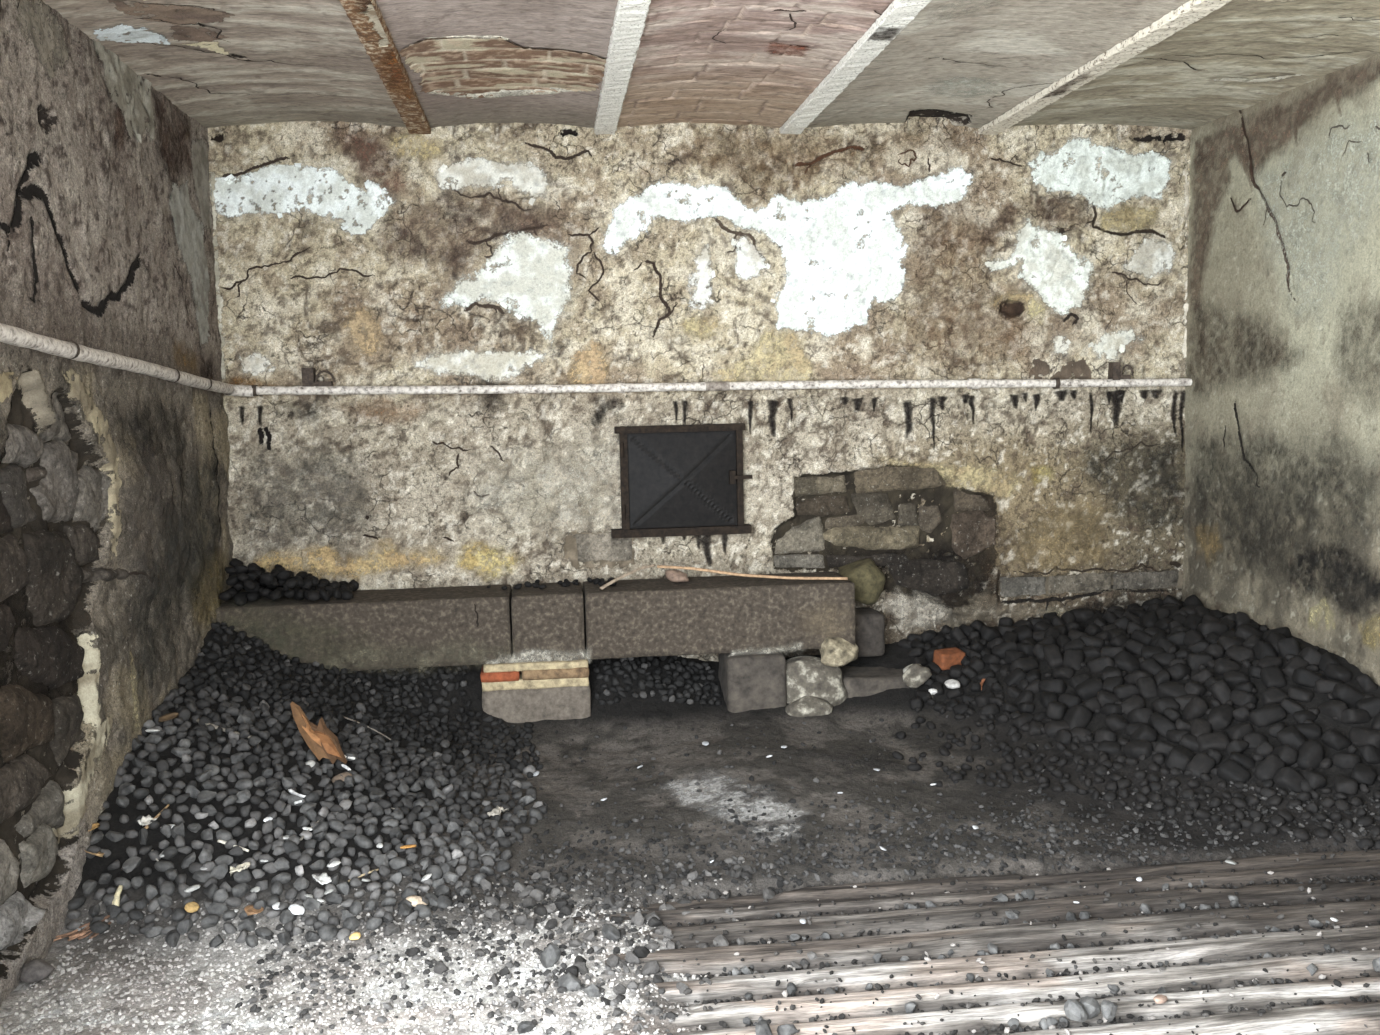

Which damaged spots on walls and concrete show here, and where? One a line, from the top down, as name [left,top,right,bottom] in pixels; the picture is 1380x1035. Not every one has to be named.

crack [0,151,190,322]
leakage [239,405,263,425]
peeling [415,231,573,382]
crack [452,188,678,342]
leakage [673,401,688,424]
peeling [603,166,973,337]
leakage [841,397,877,411]
crack [1059,203,1168,239]
leakage [988,62,1380,647]
crack [1230,110,1315,303]
spalling [771,464,1184,610]
spalling [0,367,129,979]